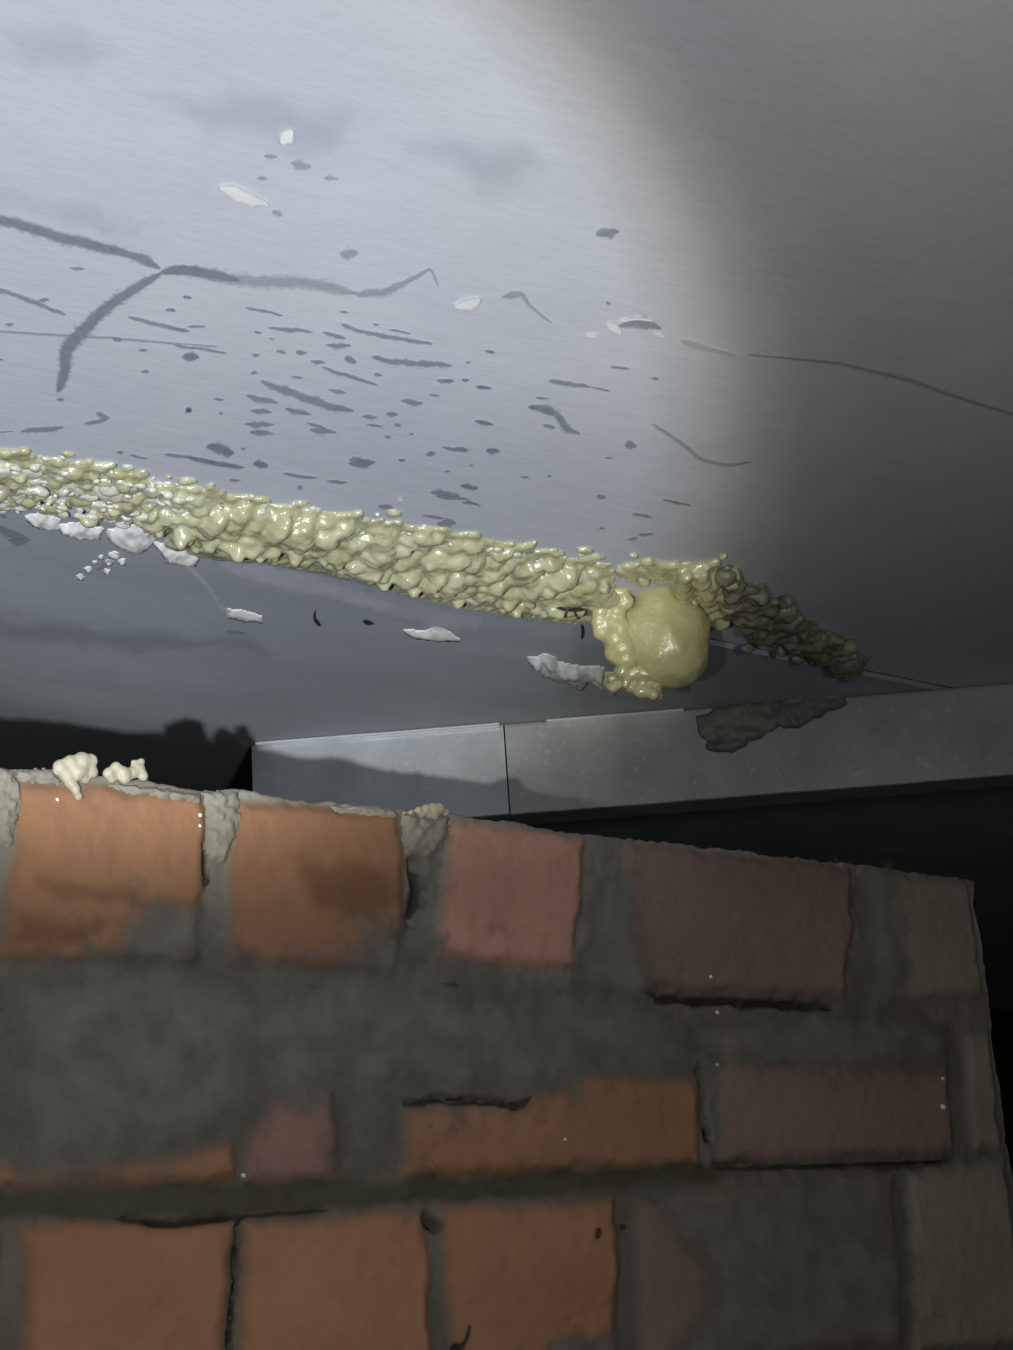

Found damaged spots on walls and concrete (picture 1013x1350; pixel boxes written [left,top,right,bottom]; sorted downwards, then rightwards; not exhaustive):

crack [0,217,239,392]
crack [114,1209,329,1350]
crack [450,1324,471,1350]